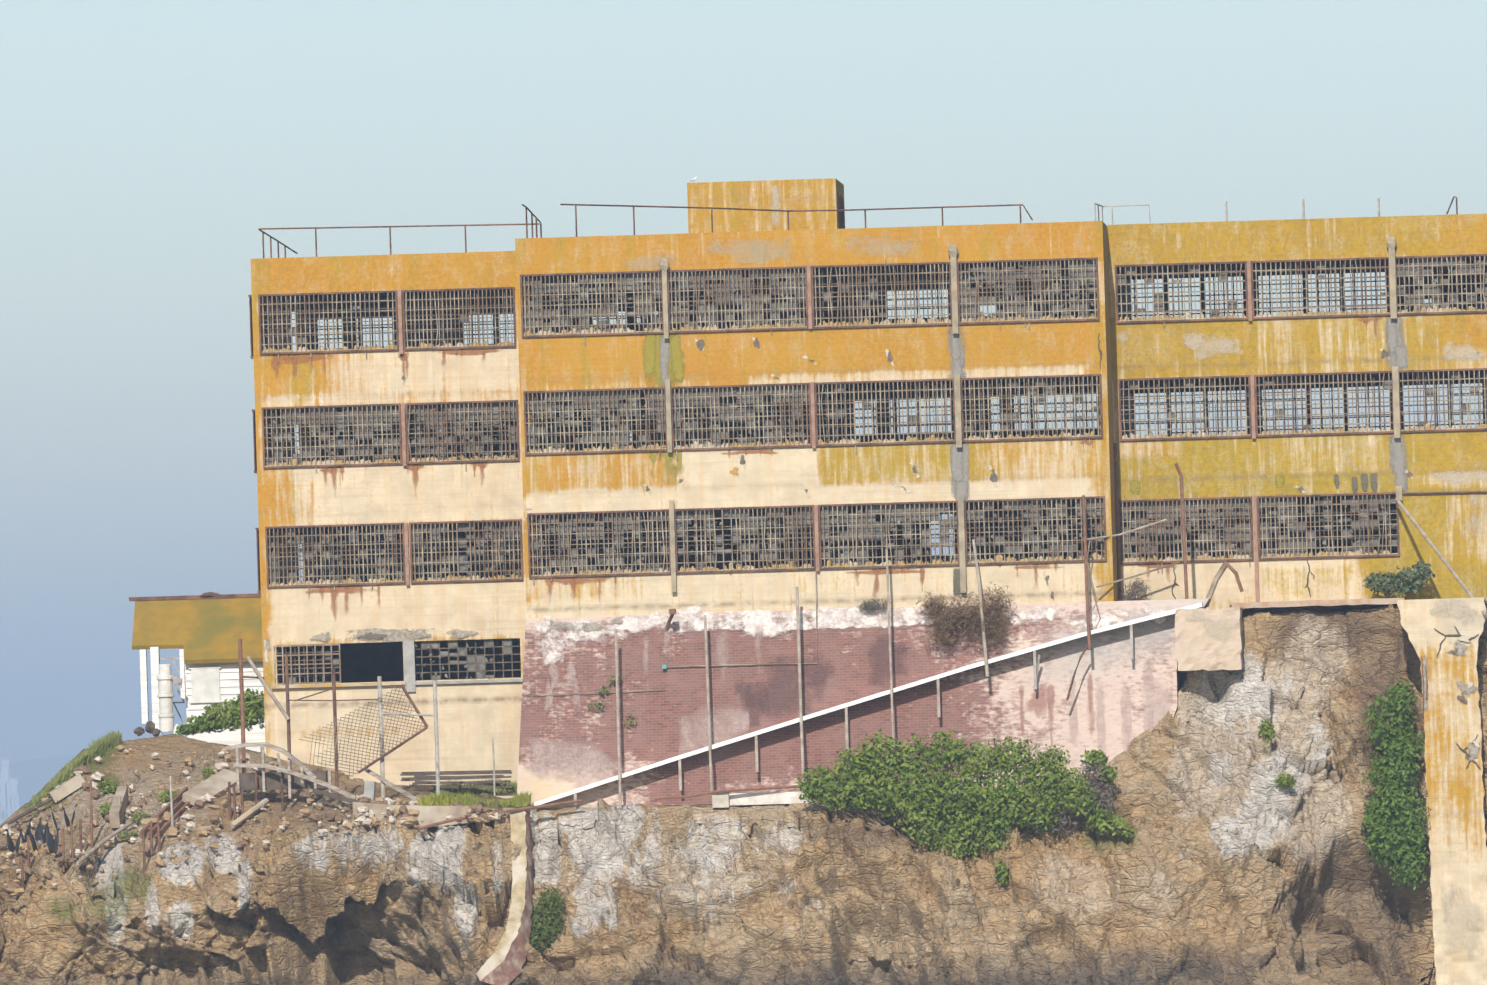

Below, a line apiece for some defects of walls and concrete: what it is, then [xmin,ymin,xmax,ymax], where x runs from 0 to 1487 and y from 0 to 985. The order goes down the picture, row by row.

damp [643,330,684,386]
damp [1386,315,1408,369]
corrosion [321,467,344,485]
corrosion [407,464,424,483]
damp [950,442,969,501]
corrosion [308,585,380,614]
peeling [534,572,1175,664]